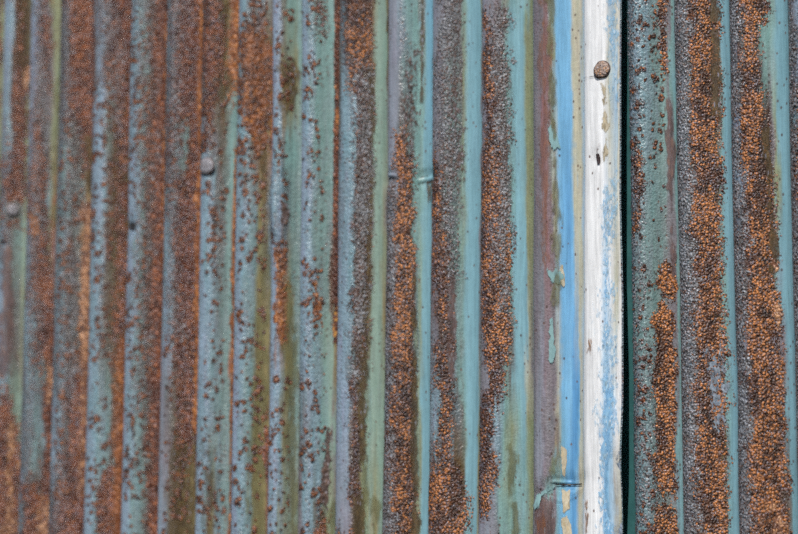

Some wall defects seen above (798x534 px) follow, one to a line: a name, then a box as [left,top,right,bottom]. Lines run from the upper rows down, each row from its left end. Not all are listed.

rust [0,0,377,534]
rust [382,0,518,534]
peeling [561,489,572,534]
rust [627,0,798,534]